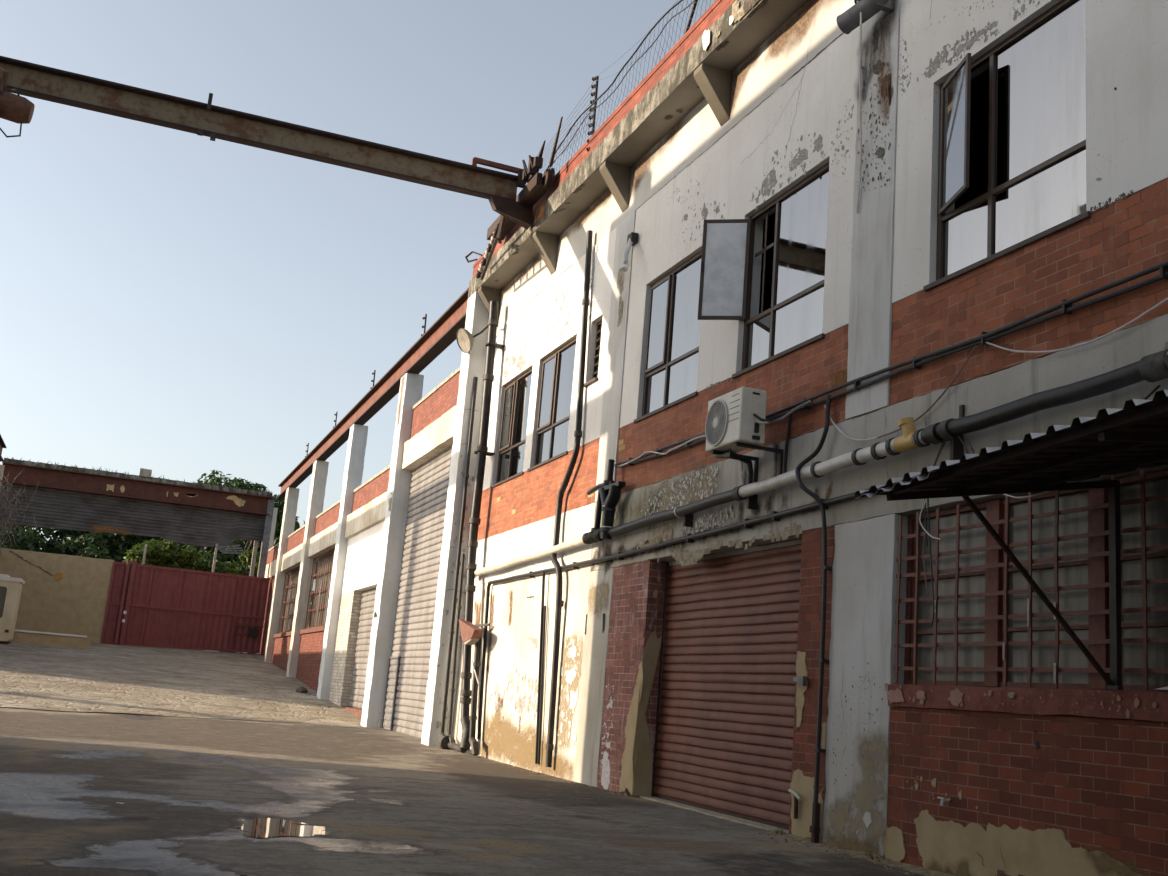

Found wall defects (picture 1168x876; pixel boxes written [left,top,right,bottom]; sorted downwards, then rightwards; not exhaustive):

peeling [749,1,1001,210]
peeling [502,276,595,378]
peeling [645,466,718,516]
spalling [632,504,802,617]
leakage [481,710,572,779]
peeling [557,614,587,749]
peeling [619,631,662,796]
peeling [795,651,808,729]
peeling [790,722,879,842]
leakage [827,736,887,855]
peeling [835,663,933,738]